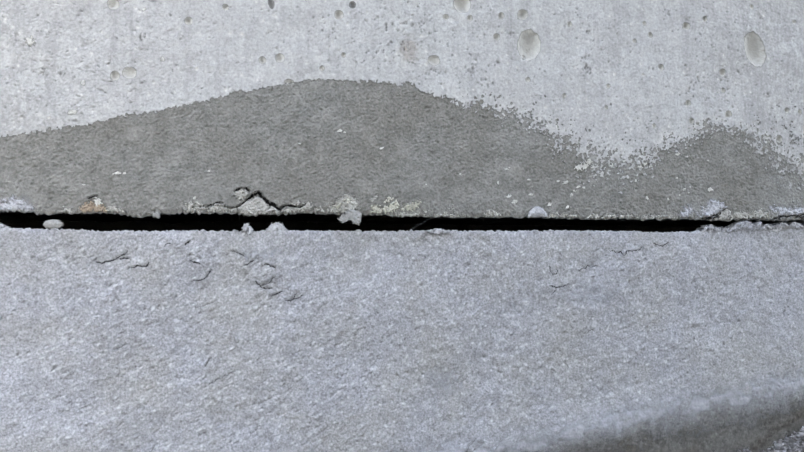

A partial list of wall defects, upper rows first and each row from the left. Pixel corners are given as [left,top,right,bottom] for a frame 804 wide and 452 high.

spalling [183,187,328,216]
leakage [0,78,804,235]